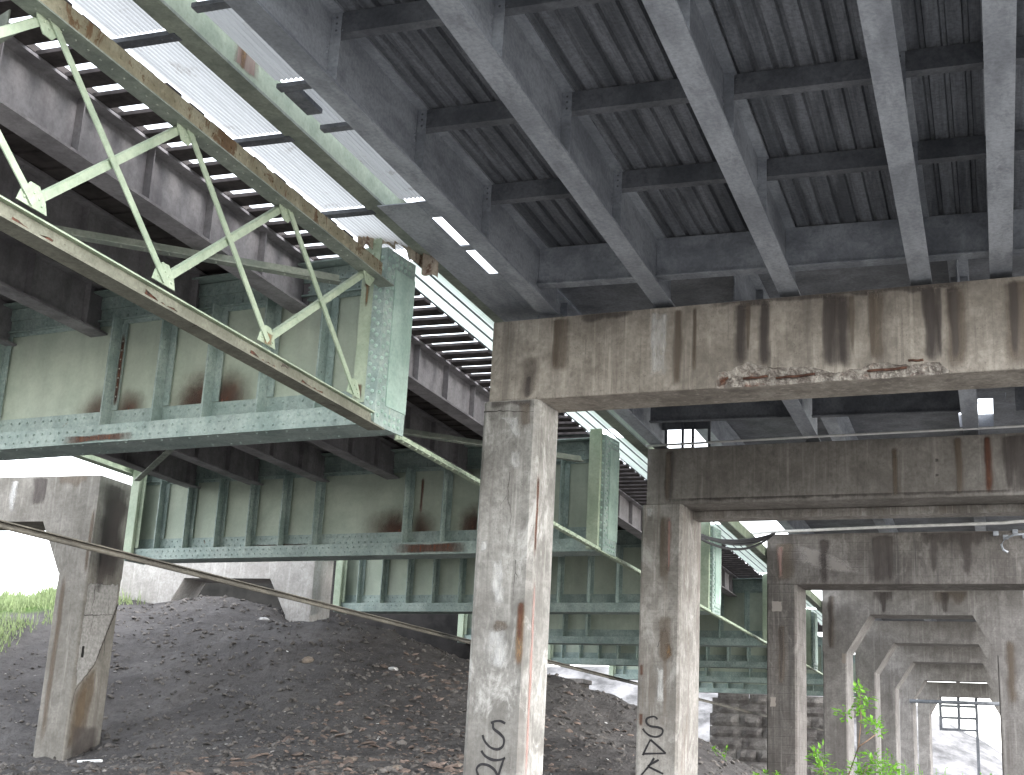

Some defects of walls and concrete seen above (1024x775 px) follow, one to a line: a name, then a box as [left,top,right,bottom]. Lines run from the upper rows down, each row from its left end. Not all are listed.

rust [181,386,203,405]
rust [219,381,242,402]
leakage [553,320,566,367]
leakage [651,309,696,378]
spalling [716,358,949,388]
leakage [730,282,964,362]
leakage [1009,282,1024,358]
rust [69,433,123,443]
rust [406,480,457,552]
rust [463,514,477,530]
leakage [873,536,892,611]
rust [495,591,535,766]